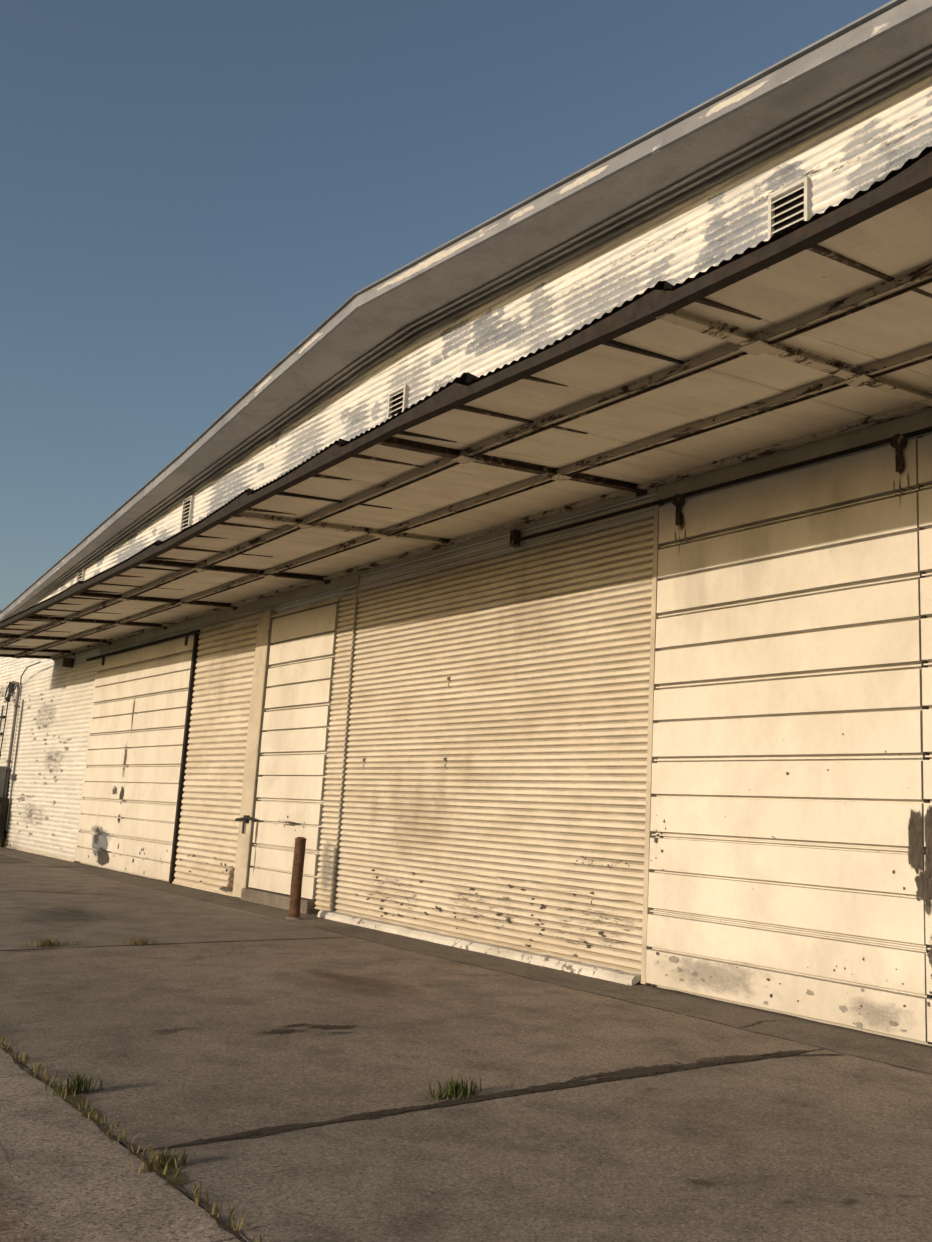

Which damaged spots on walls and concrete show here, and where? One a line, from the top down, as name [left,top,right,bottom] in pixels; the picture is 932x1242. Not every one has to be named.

peeling [696,79,770,120]
peeling [269,93,932,477]
peeling [199,462,265,520]
peeling [356,894,458,929]
peeling [508,884,547,947]
peeling [656,952,711,982]
crack [2,923,932,1086]
peeling [839,989,907,1032]
crack [0,1037,531,1242]